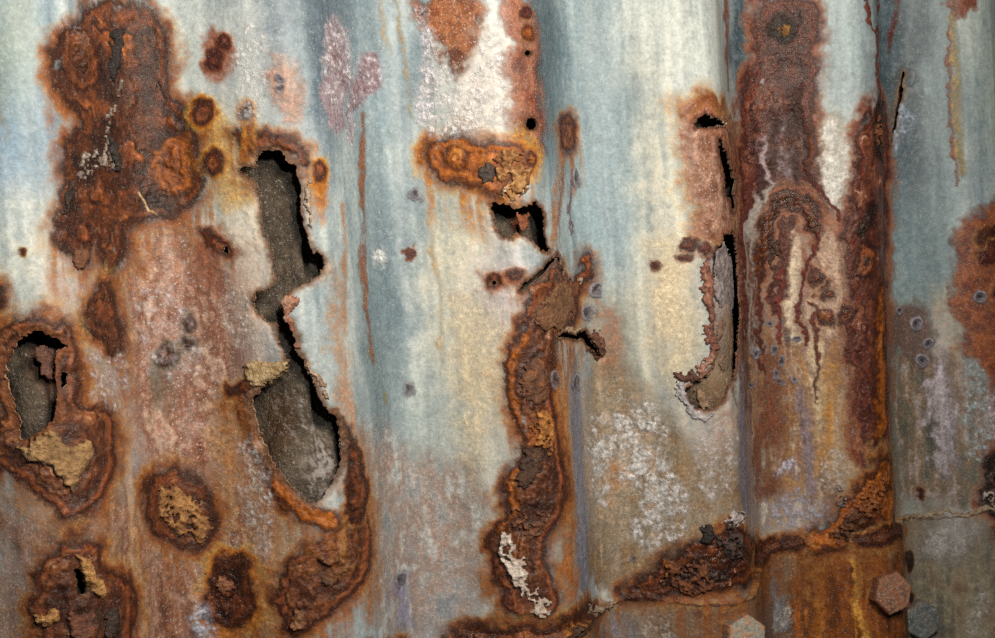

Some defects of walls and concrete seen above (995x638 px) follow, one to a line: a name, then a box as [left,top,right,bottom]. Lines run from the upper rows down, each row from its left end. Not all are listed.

peeling [516,212,530,231]
peeling [673,136,775,410]
peeling [281,293,301,348]
rust [0,0,609,638]
rust [581,0,995,638]
peeling [35,345,54,380]
peeling [243,359,288,387]